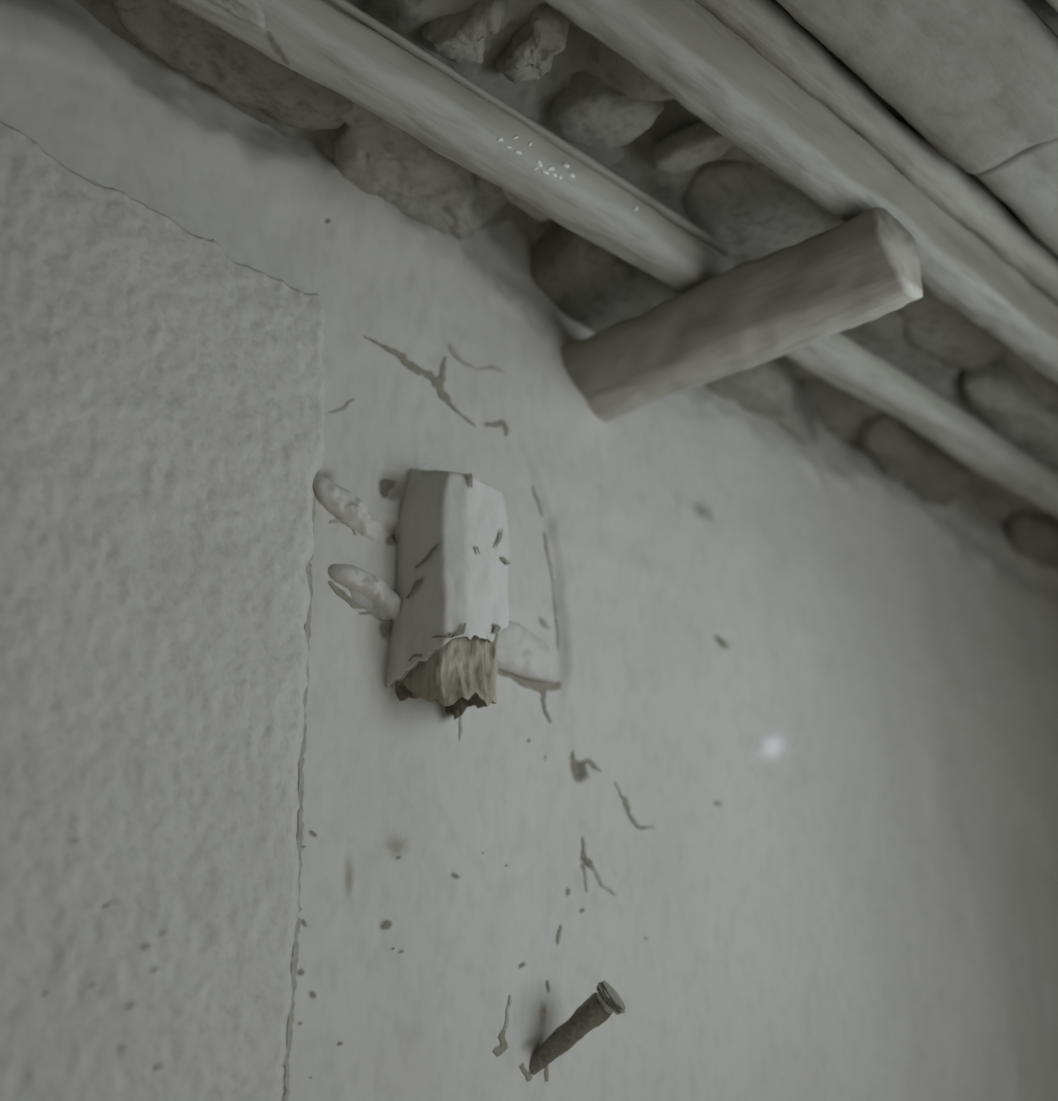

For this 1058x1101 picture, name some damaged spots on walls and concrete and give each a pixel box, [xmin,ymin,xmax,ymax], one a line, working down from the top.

crack [365,336,509,436]
spalling [381,479,395,497]
crack [615,782,654,830]
crack [581,837,617,896]